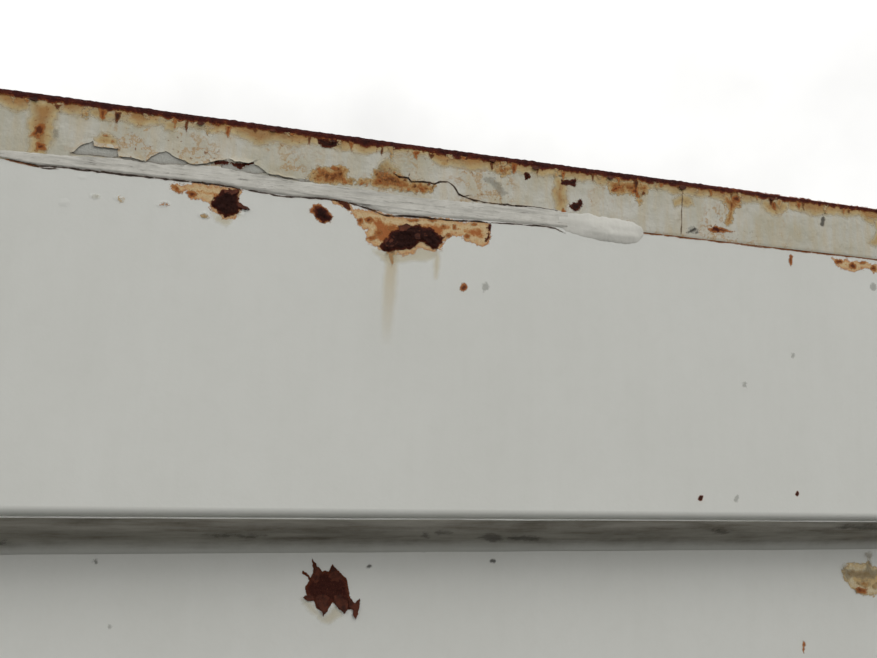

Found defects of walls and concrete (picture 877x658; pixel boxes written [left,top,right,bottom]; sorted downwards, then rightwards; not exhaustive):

peeling [70,138,311,182]
crack [11,160,562,232]
corrosion [0,89,877,274]